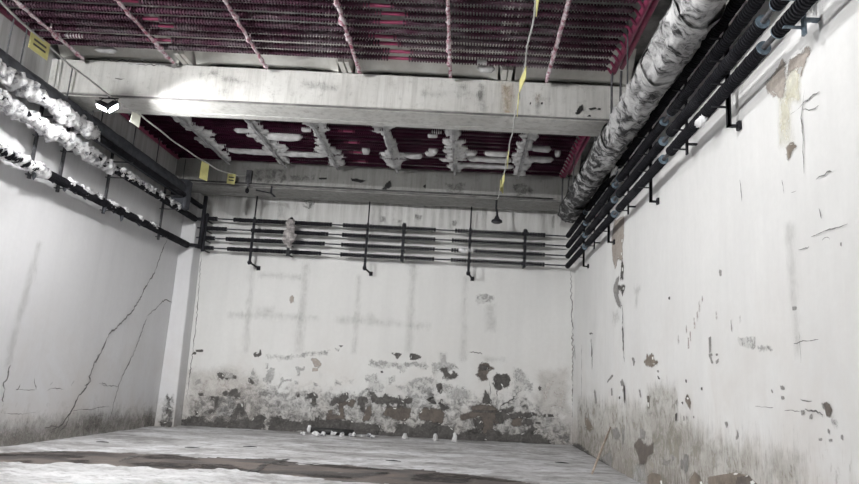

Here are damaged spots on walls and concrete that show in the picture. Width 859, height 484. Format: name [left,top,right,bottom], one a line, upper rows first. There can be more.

peeling [766,46,811,99]
peeling [612,216,625,308]
crack [1,240,170,434]
peeling [632,353,660,379]
water stain [194,388,426,434]
peeling [159,345,612,467]
peeling [819,402,843,442]
peeling [612,428,757,484]